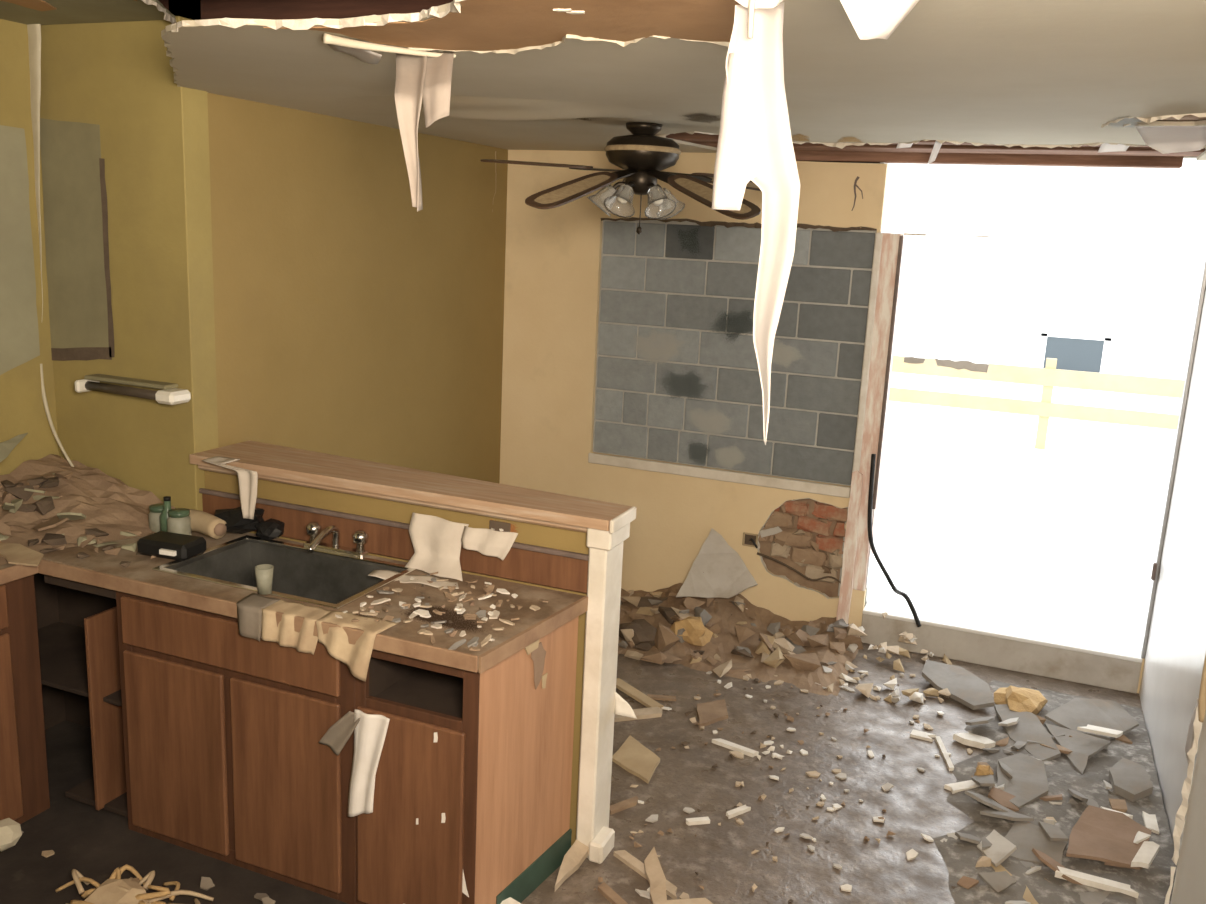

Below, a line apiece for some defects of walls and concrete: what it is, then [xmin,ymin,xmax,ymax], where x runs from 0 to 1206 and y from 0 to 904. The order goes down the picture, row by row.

peeling [308,0,740,55]
peeling [0,0,176,375]
flaking render [757,498,848,599]